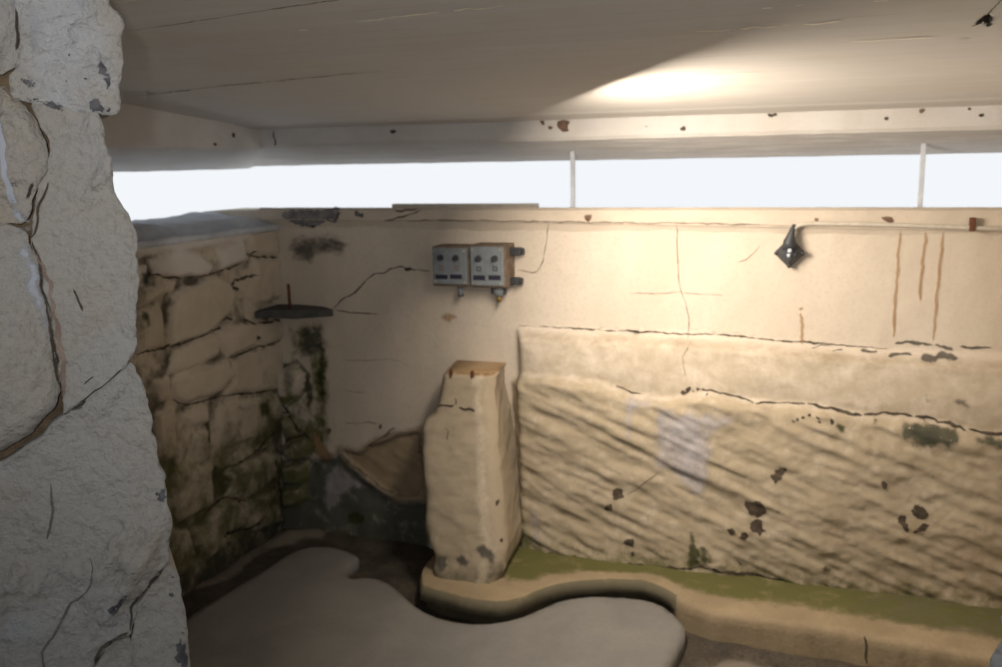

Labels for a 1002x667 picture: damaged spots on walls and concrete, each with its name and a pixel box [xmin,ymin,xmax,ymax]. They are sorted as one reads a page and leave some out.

water stain [293,239,343,260]
crack [334,266,426,315]
corrosion [893,232,901,337]
corrosion [919,233,927,300]
corrosion [933,234,944,340]
water stain [299,326,323,356]
crack [390,208,1002,440]
water stain [903,424,958,447]
water stain [978,436,1002,448]
peeling [770,468,787,483]
peeling [727,501,766,540]
peeling [897,504,929,533]